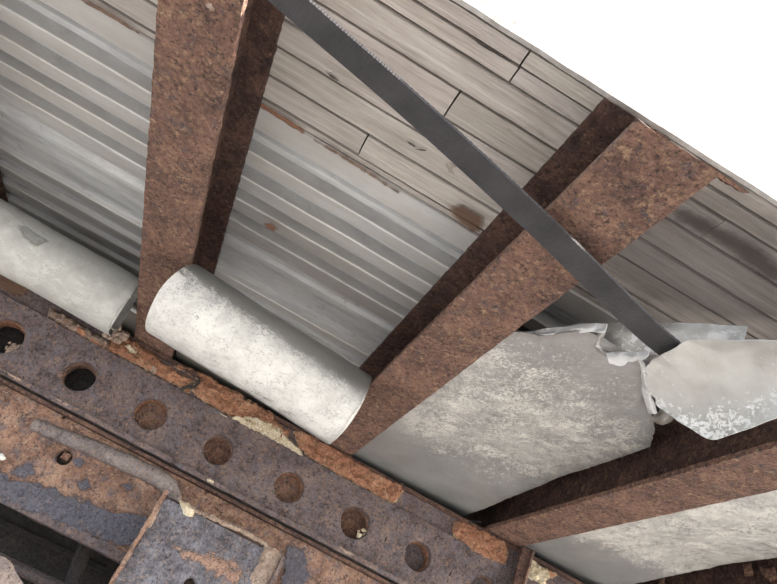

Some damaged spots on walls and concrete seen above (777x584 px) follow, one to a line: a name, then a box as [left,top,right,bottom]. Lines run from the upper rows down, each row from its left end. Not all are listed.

rust [314,140,399,193]
rust [700,160,749,193]
leakage [450,206,482,232]
leakage [680,213,777,279]
rust [0,274,26,295]
rust [46,308,404,504]
peeling [221,414,303,456]
peeling [0,453,147,546]
rust [174,500,281,584]
peeling [280,544,309,584]
rust [451,521,509,565]
rust [528,559,557,584]